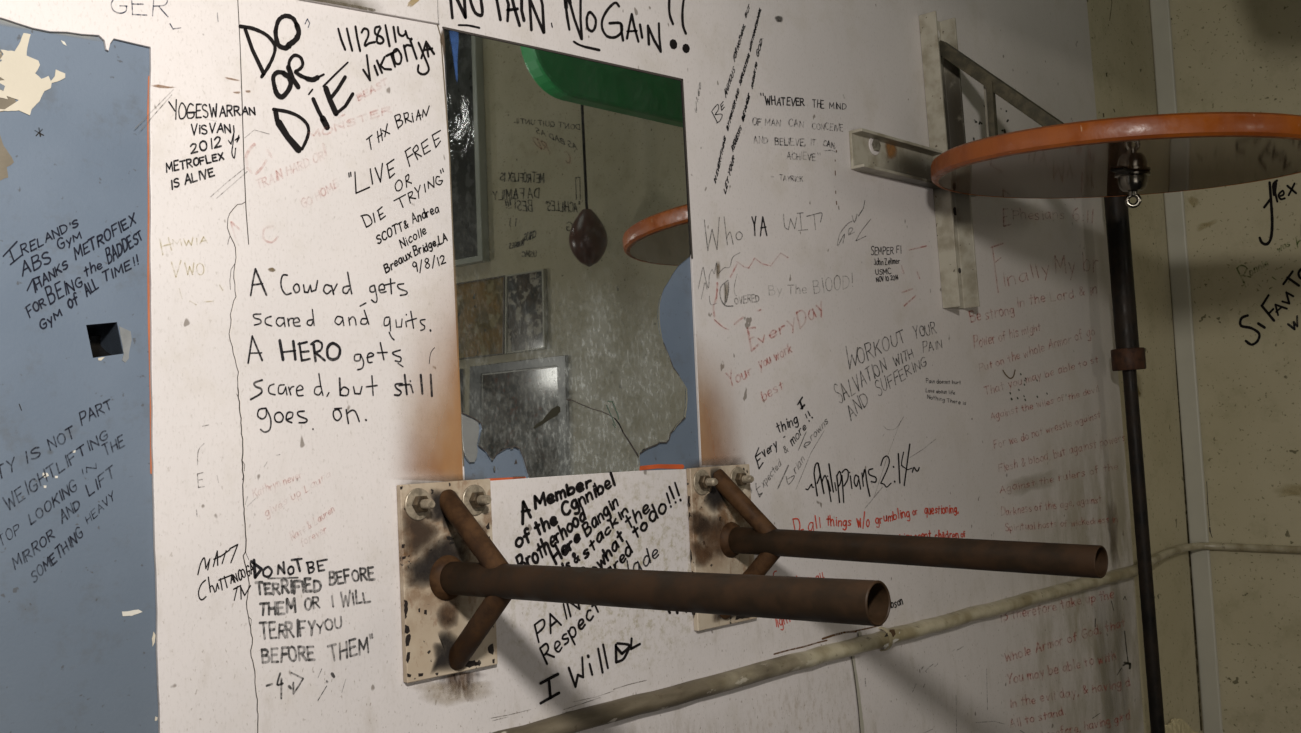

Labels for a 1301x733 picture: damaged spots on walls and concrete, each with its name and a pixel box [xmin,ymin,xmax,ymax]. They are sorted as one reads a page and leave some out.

rust [416,338,463,481]